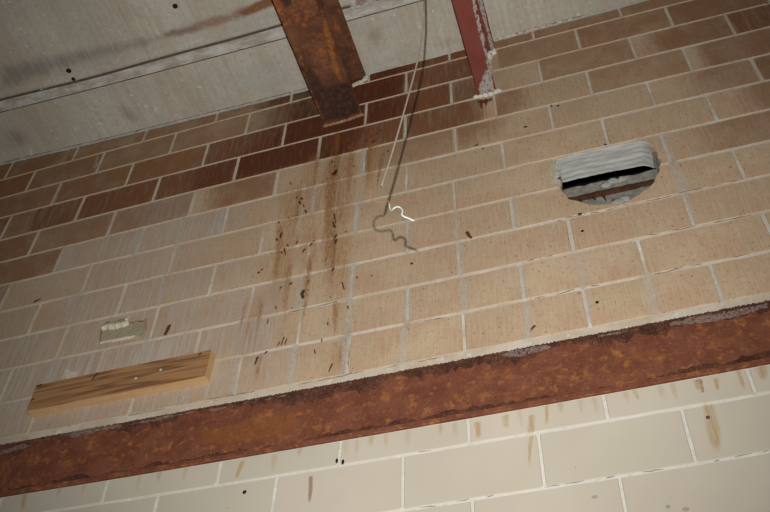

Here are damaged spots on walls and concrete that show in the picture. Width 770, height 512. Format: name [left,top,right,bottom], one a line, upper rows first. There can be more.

corrosion [0,22,492,281]
hole [548,141,662,205]
spalling [100,316,146,344]